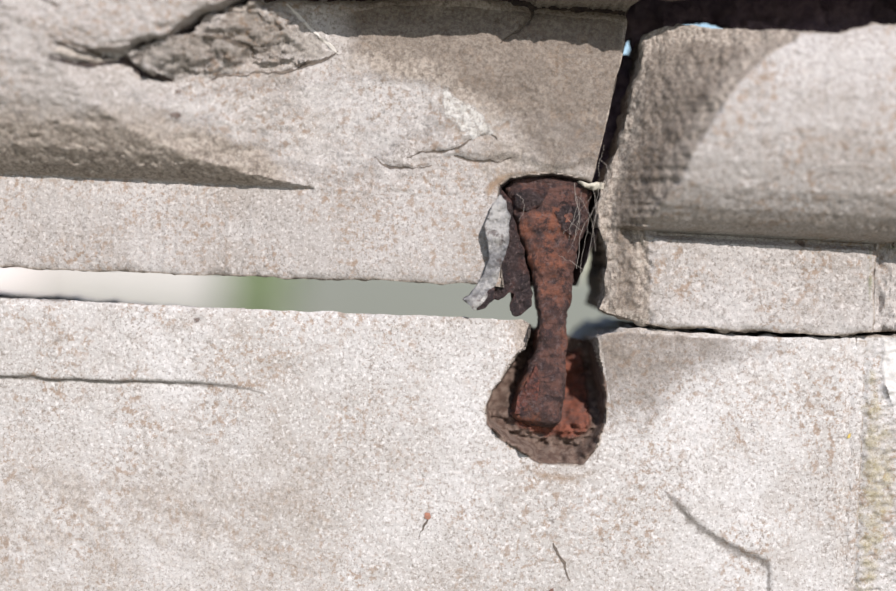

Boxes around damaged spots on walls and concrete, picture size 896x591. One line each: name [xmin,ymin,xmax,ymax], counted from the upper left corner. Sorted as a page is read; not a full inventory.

crack [232,0,276,8]
crack [500,0,625,43]
spalling [48,0,447,179]
corrosion [487,173,599,285]
corrosion [487,327,607,464]